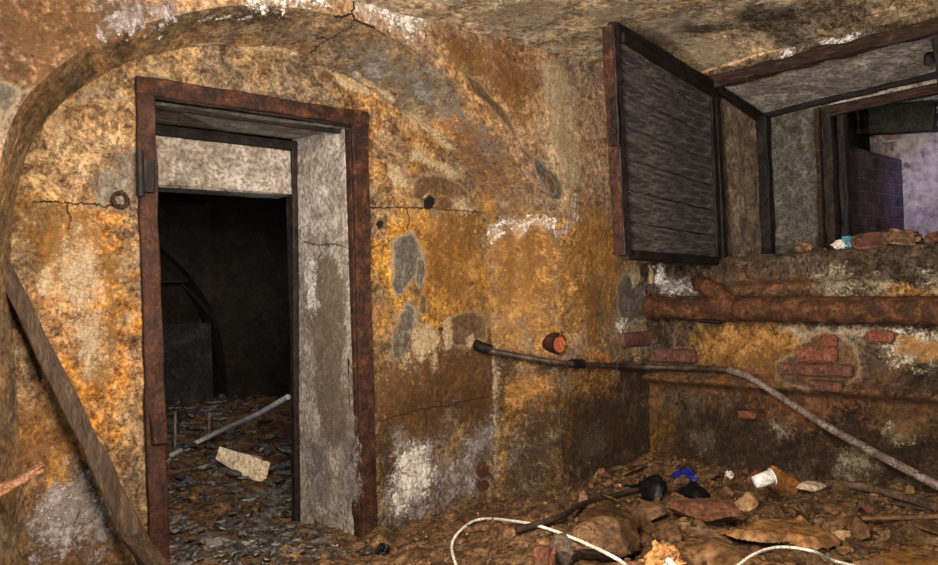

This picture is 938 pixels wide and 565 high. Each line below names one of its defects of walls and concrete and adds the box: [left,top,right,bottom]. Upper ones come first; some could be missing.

leakage [0,0,151,101]
leakage [190,0,330,29]
crack [310,1,375,54]
crack [31,200,131,230]
flaking render [372,231,488,372]
leakage [374,188,938,532]
flaking render [615,263,699,363]
flaking render [774,330,862,393]
flaking render [866,330,896,343]